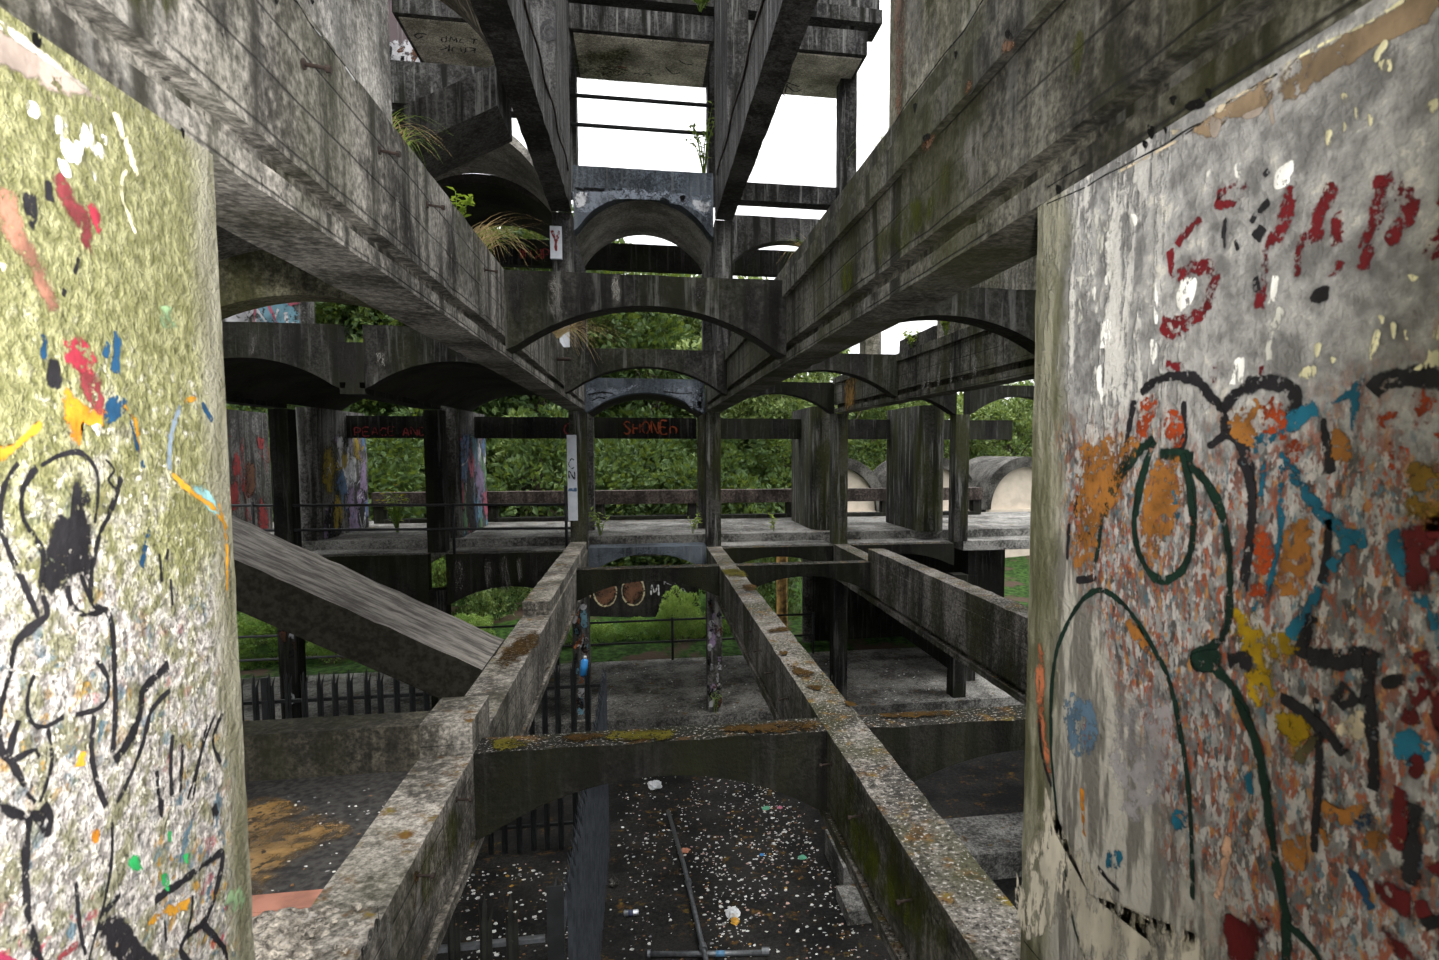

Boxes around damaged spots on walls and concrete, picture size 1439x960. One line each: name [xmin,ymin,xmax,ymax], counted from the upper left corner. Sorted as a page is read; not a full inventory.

peeling [0,20,99,100]
leakage [894,0,936,117]
peeling [1142,0,1439,148]
peeling [28,100,139,234]
leakage [876,131,994,265]
peeling [1299,342,1336,379]
peeling [1369,315,1408,361]
peeling [1414,326,1439,370]